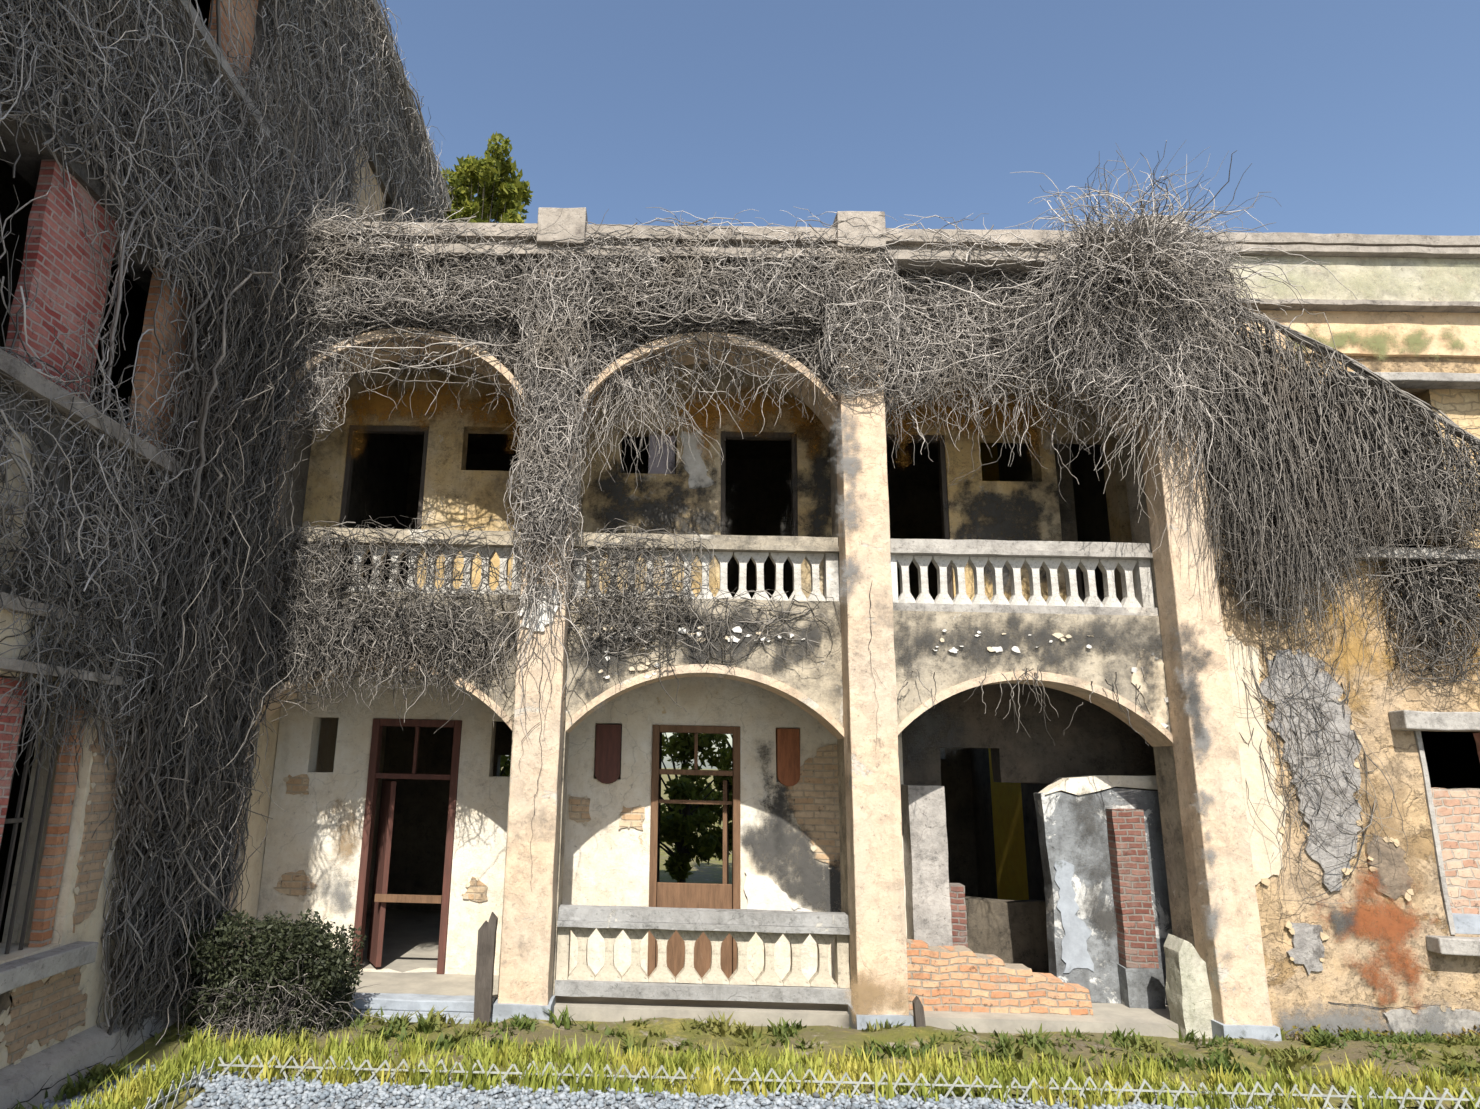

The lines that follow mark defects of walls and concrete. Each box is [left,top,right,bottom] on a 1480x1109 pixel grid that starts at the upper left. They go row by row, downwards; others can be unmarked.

damp [581,460,730,535]
damp [680,373,861,537]
damp [944,475,1070,541]
damp [568,603,834,707]
damp [894,598,1212,768]
peeling [73,710,124,933]
flaking render [462,876,488,902]
damp [741,746,841,912]
flaking render [784,744,840,870]
flaking render [1224,631,1414,902]
rust [1329,873,1420,1008]
peeling [0,965,88,1065]